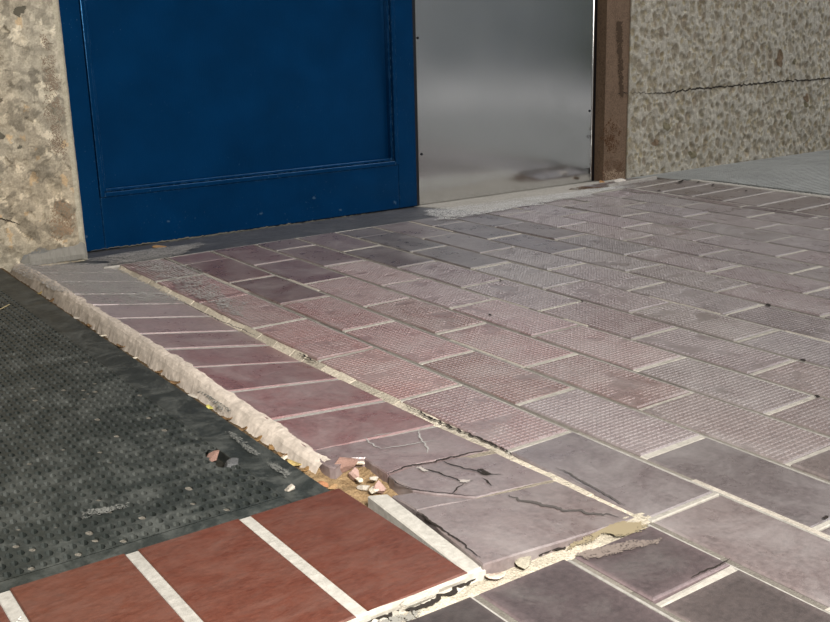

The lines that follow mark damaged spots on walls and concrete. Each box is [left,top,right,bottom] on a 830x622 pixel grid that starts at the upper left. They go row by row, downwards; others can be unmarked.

crack [618,77,830,94]
crack [366,405,511,496]
crack [509,467,625,517]
crack [417,511,480,557]
crack [367,579,476,622]